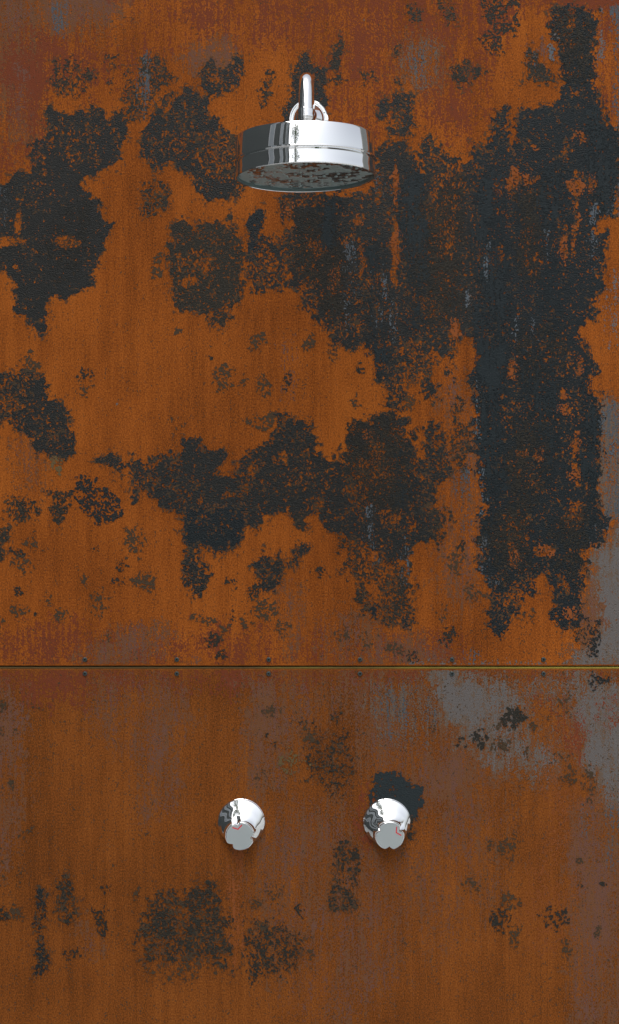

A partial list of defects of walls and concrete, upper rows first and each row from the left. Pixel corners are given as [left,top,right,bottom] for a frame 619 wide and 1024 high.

rust [389,167,402,205]
rust [493,166,538,192]
rust [557,172,596,266]
rust [556,387,597,491]
rust [223,845,247,979]